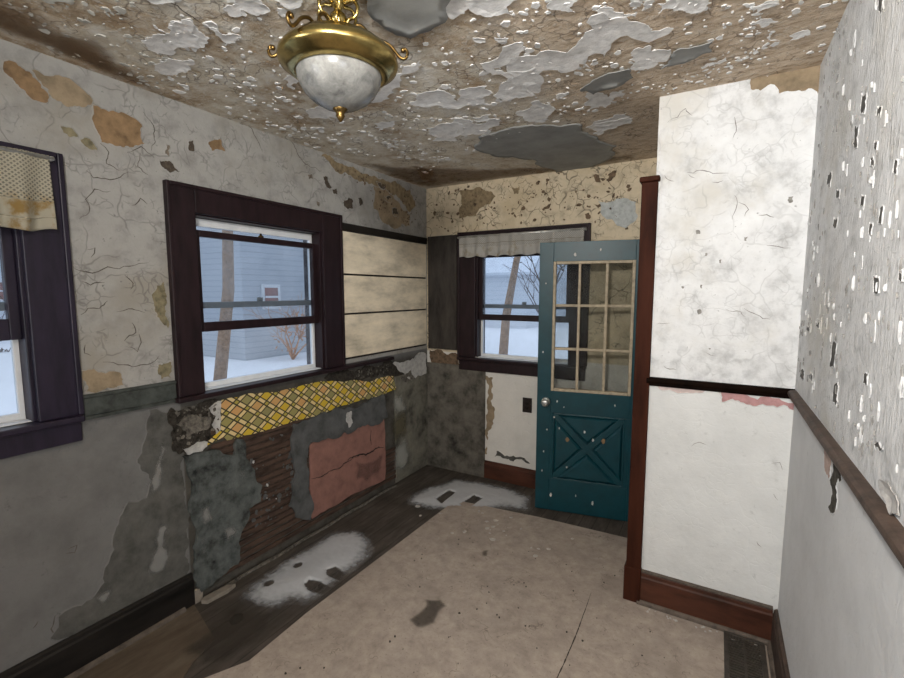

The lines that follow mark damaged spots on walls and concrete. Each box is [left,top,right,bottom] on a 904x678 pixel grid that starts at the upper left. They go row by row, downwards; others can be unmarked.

peeling [24,6,80,58]
water stain [0,10,121,71]
spalling [1,59,145,151]
spalling [49,399,396,641]
spalling [824,450,843,516]
peeling [878,479,900,516]